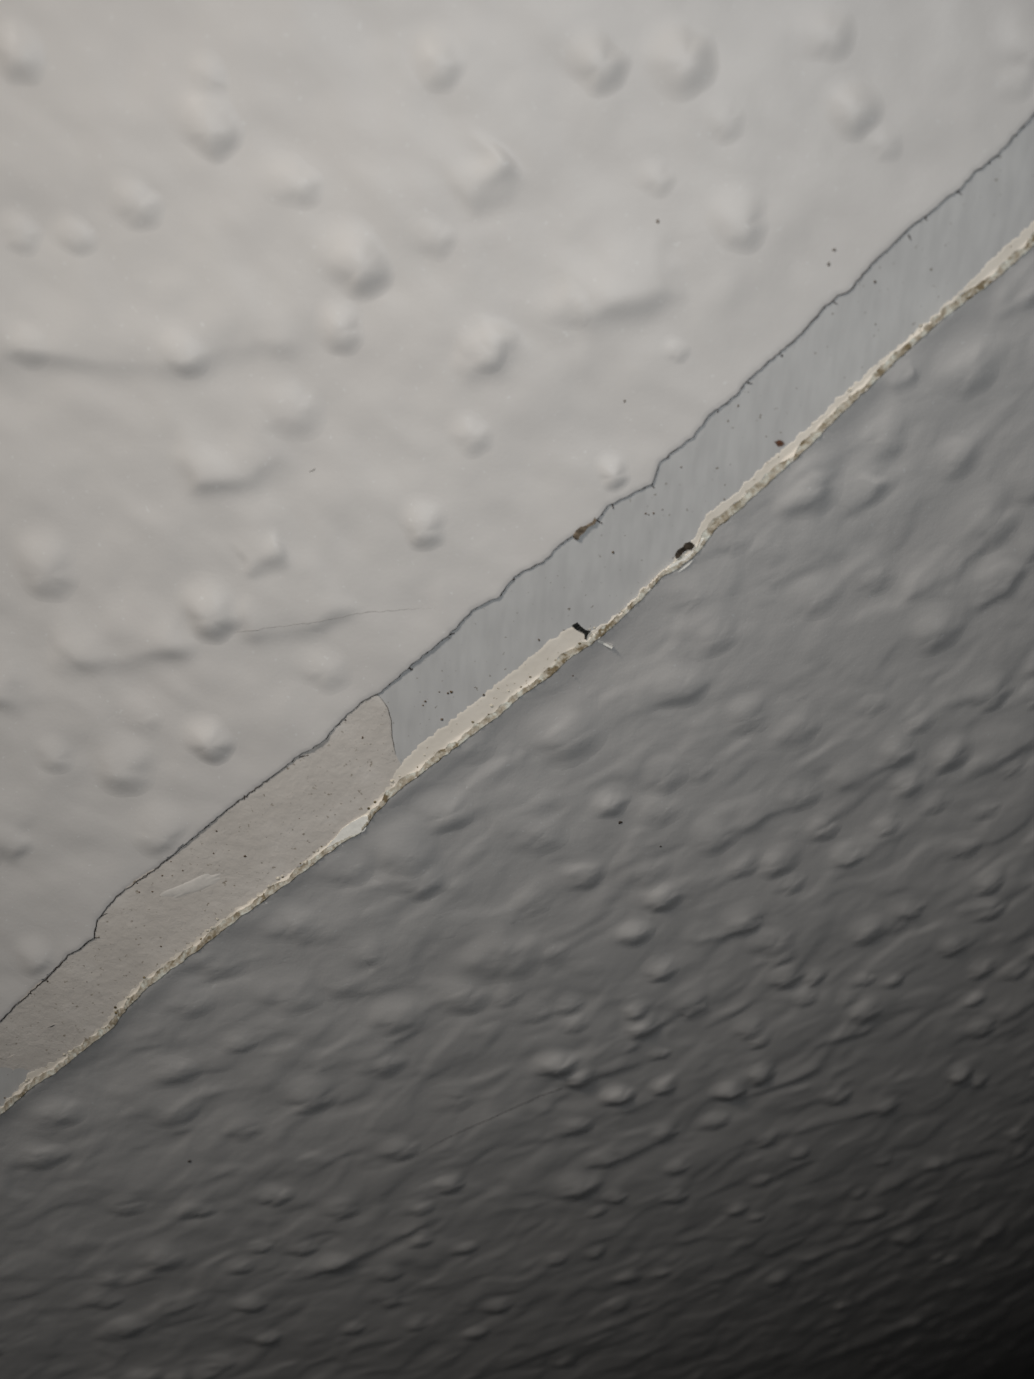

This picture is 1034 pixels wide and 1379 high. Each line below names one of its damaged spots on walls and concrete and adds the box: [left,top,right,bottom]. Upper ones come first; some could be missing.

crack [0,114,1034,1022]
peeling [0,115,1034,1116]